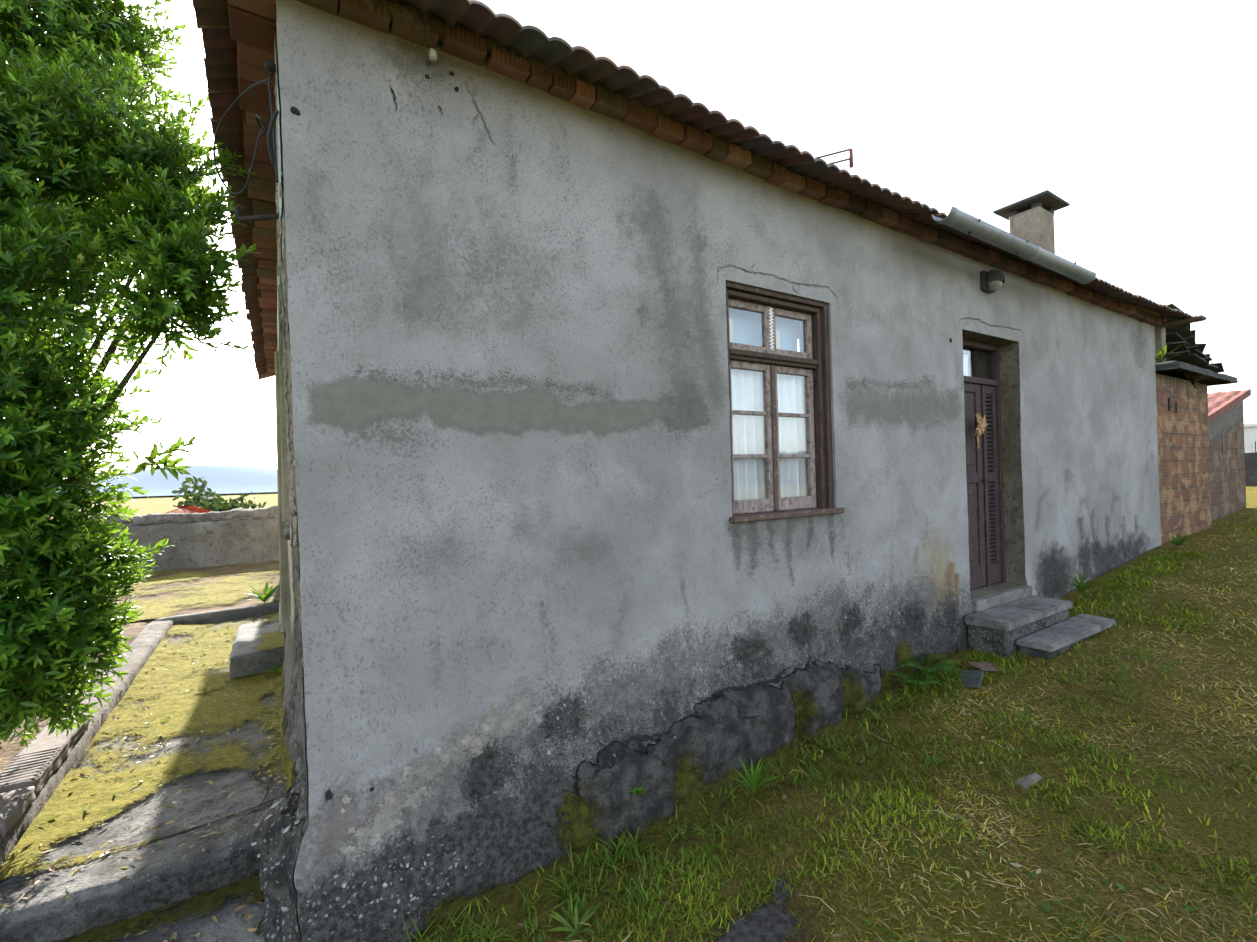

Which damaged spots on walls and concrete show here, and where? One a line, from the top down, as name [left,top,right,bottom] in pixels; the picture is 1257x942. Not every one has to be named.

crack [468,88,498,147]
flaking render [274,9,307,820]
damp [729,520,795,585]
damp [1036,510,1149,599]
damp [281,563,308,799]
damp [294,570,974,942]